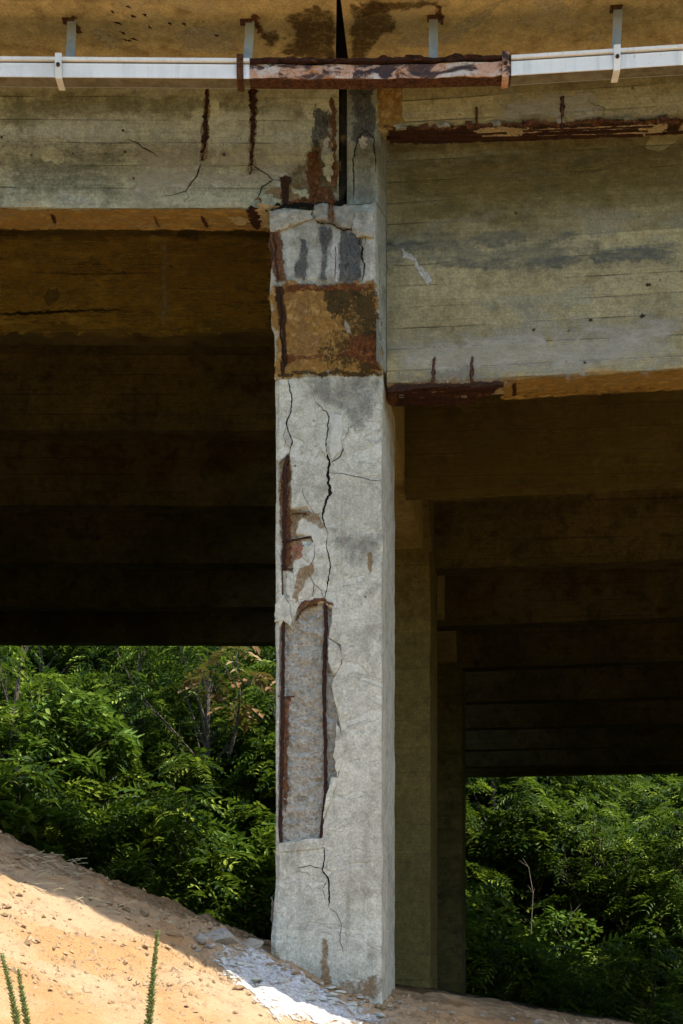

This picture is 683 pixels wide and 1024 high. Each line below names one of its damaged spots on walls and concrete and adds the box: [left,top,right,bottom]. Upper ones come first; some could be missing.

water stain [261,0,437,58]
crack [164,164,201,200]
spalling [228,89,683,239]
corrosion [0,97,384,379]
water stain [294,239,308,280]
water stain [318,226,363,282]
crack [283,380,379,598]
spalling [274,454,350,853]
crack [299,844,344,953]